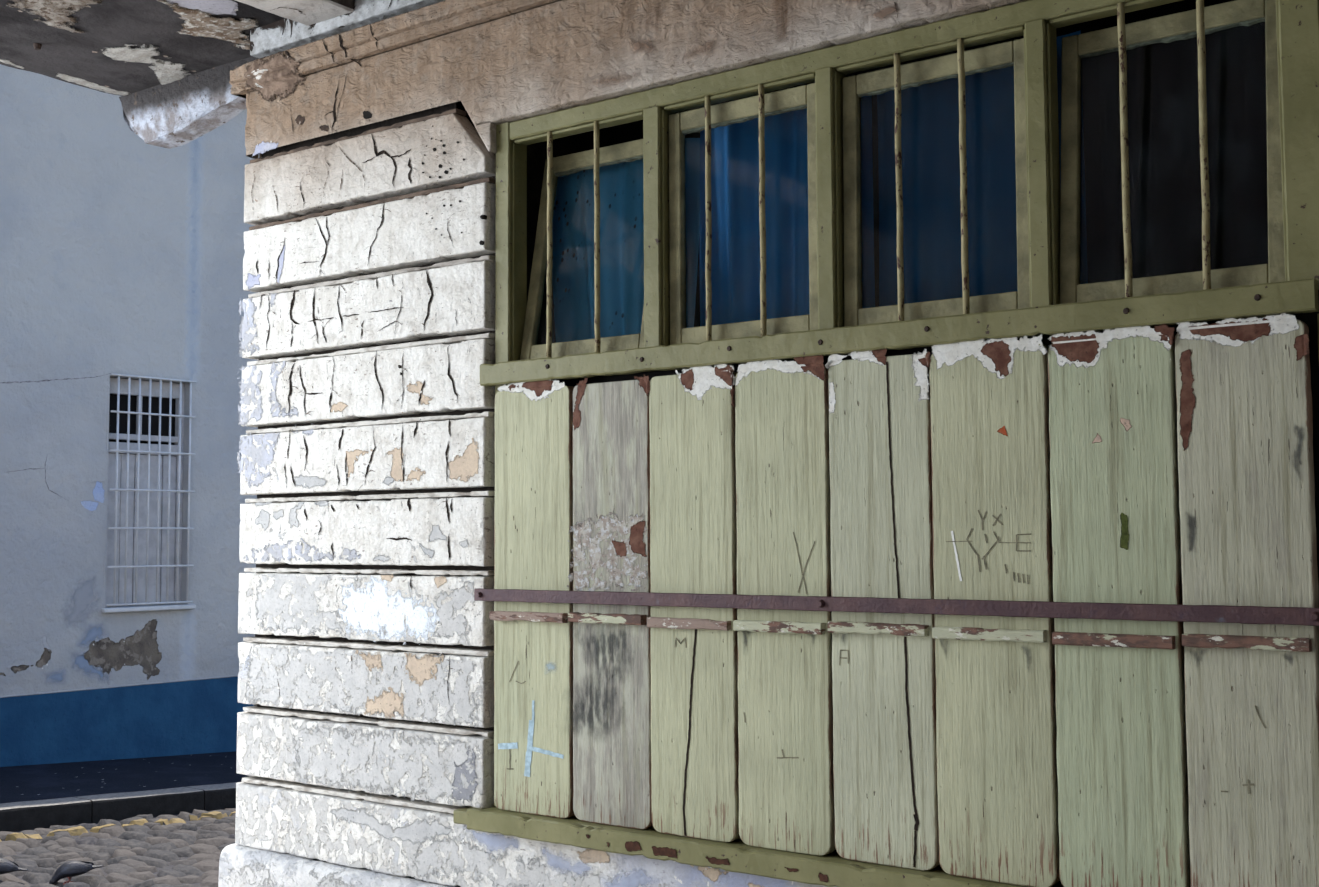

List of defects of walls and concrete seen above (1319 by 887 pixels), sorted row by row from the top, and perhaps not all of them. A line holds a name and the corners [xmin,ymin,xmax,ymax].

flaking render [6,0,103,33]
flaking render [57,73,132,96]
flaking render [92,44,196,85]
flaking render [156,0,306,103]
crack [251,0,459,558]
peeling [675,351,884,414]
spalling [1120,513,1129,550]
peeling [236,245,670,887]
peeling [0,635,52,677]
peeling [84,619,162,680]
peeling [224,862,284,887]
peeling [625,841,730,887]